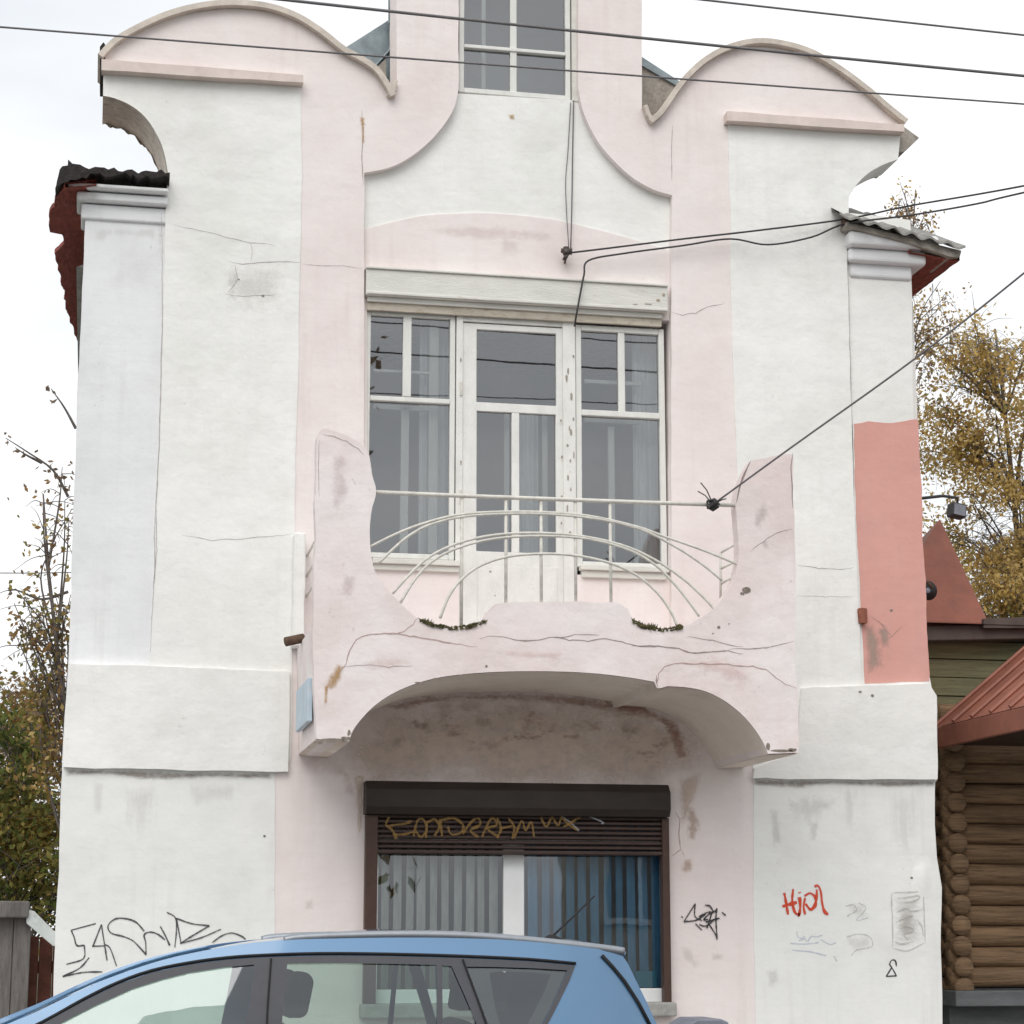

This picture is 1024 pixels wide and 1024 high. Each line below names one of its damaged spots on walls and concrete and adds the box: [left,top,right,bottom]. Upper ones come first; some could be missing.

crack [150,213,355,651]
crack [340,618,796,688]
damp [361,713,686,777]